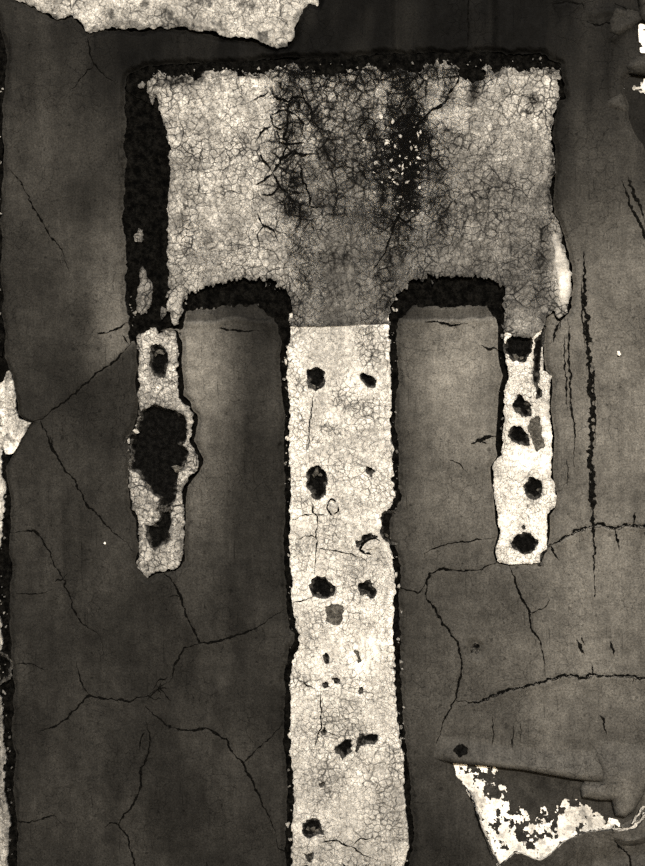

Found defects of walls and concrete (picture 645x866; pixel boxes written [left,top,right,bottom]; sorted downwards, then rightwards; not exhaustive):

peeling [16,0,564,393]
peeling [0,371,31,866]
crack [18,815,62,824]
crack [9,529,104,653]
crack [35,321,133,551]
spalling [124,404,189,566]
crack [40,573,314,866]
peeling [182,277,324,866]
peeling [355,273,552,866]
crack [400,537,645,763]
peeling [453,744,645,864]
crack [549,512,645,560]